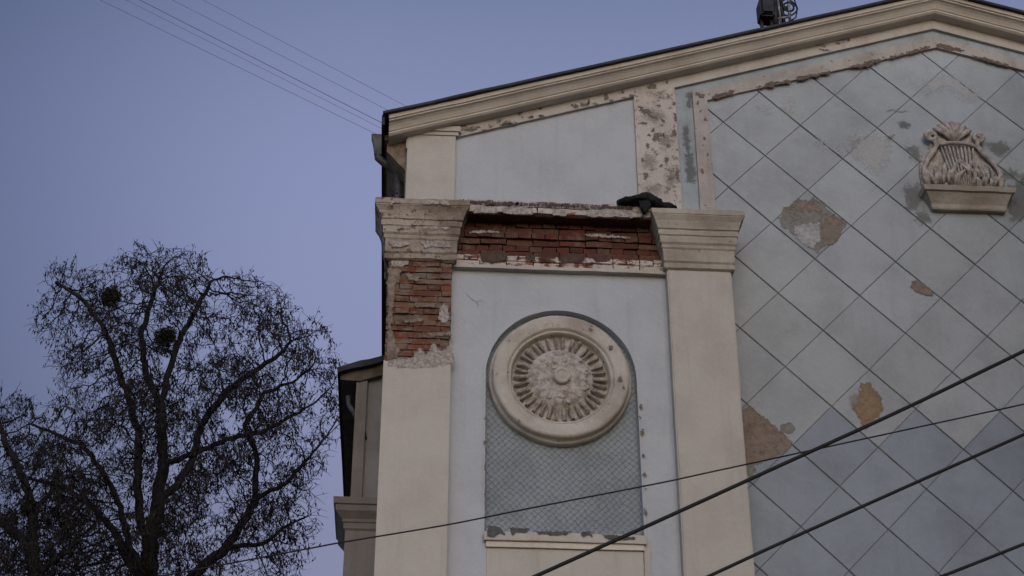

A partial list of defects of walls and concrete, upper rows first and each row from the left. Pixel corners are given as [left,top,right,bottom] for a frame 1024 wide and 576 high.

peeling [756,69,831,87]
peeling [848,43,1009,68]
peeling [695,89,736,121]
peeling [571,79,680,182]
flaking render [778,197,847,254]
flaking render [384,199,662,368]
flaking render [910,280,933,296]
flaking render [850,382,883,429]
flaking render [742,406,795,477]
peeling [487,525,635,540]